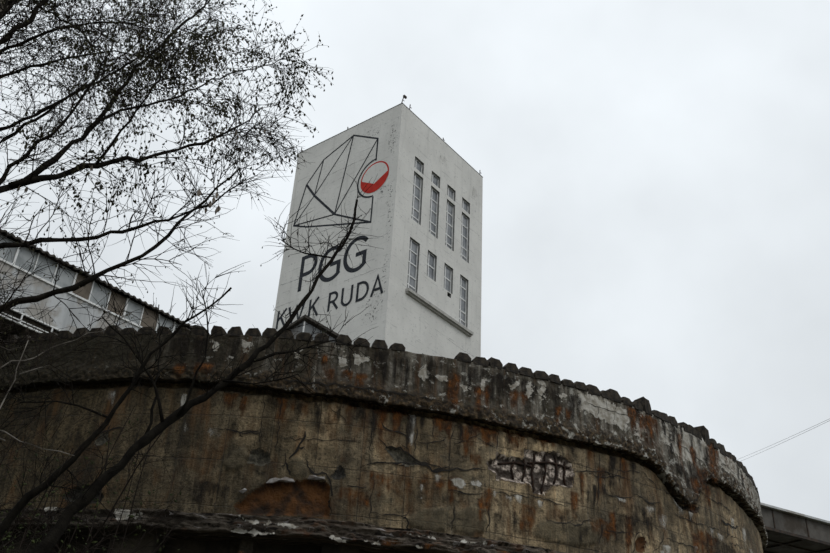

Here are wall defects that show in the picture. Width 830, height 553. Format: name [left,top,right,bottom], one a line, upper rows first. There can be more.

peeling [509,381,546,401]
peeling [576,390,646,437]
rust [627,407,658,441]
spalling [486,449,575,496]
peeling [658,419,748,490]
spalling [231,465,346,536]
spalling [635,536,647,553]